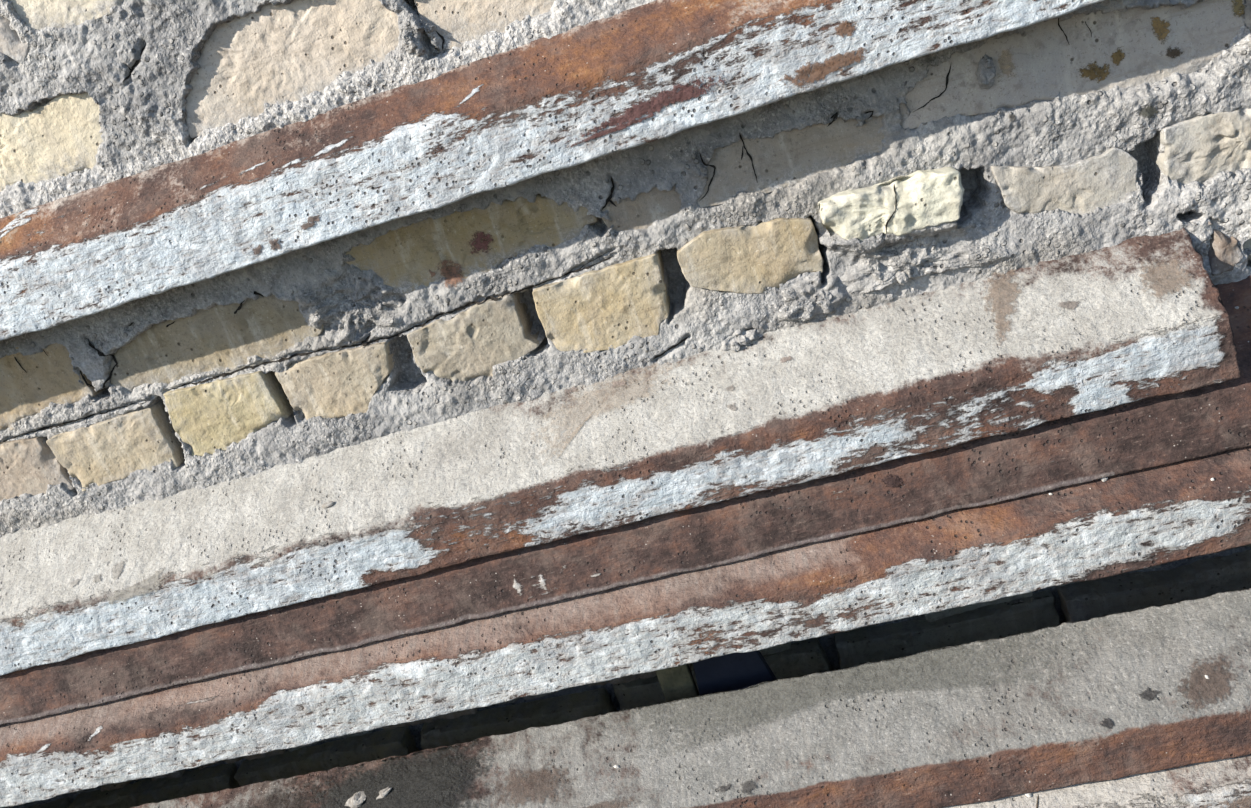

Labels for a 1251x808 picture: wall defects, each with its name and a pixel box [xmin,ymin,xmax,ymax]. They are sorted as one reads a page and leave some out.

rust [777,20,867,88]
spalling [976,54,996,89]
rust [567,75,726,147]
rust [252,238,281,255]
rust [300,215,320,230]
spalling [295,264,409,350]
rust [429,260,464,287]
rust [982,270,1021,341]
rust [1139,259,1192,299]
rust [1178,655,1238,713]
damp [246,740,495,808]
rust [490,764,569,807]